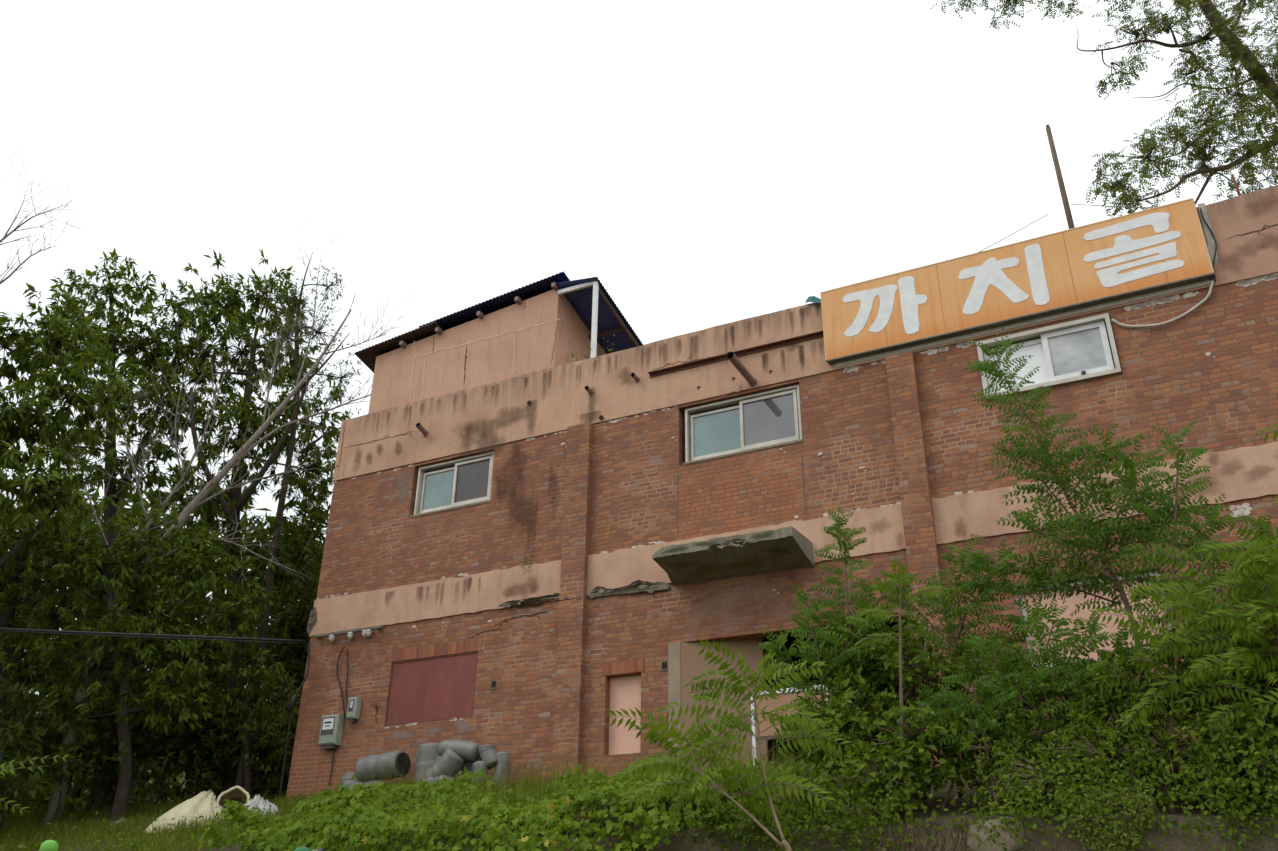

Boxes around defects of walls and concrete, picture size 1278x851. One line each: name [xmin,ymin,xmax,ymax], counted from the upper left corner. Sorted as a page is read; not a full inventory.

spalling [588,580,670,598]
spalling [499,593,560,608]